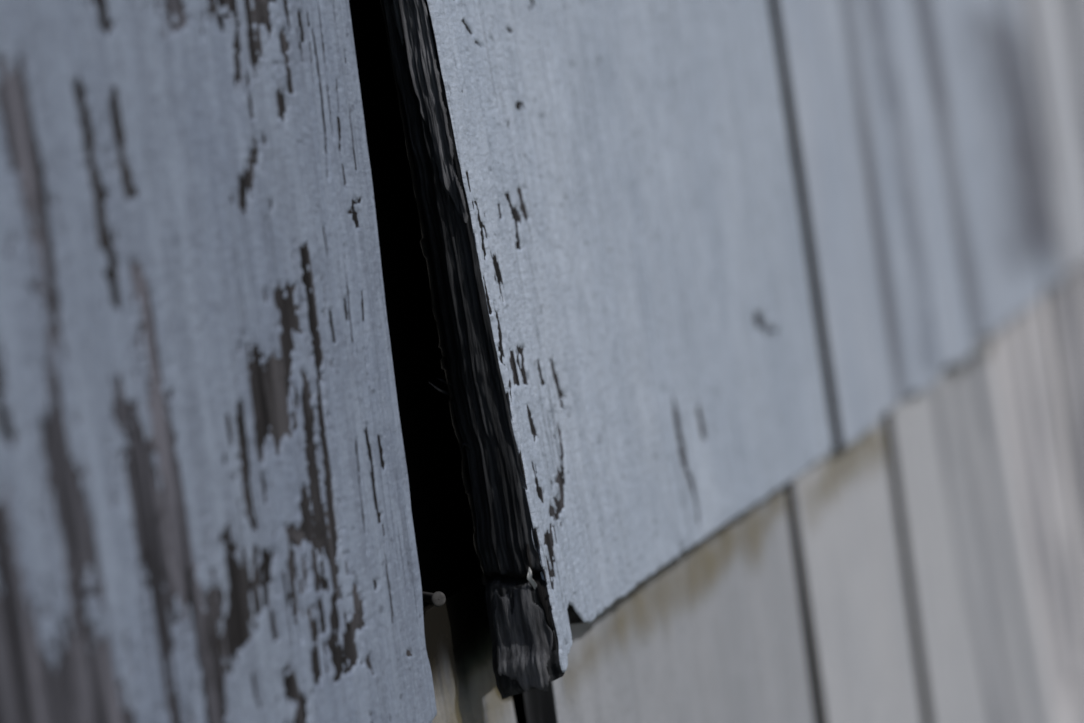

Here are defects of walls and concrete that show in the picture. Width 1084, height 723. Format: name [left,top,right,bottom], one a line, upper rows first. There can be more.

peeling [144,0,304,122]
crack [345,269,366,363]
crack [466,171,505,365]
peeling [498,187,528,250]
peeling [0,54,138,723]
peeling [70,75,373,723]
peeling [507,346,566,409]
crack [337,565,351,656]
crack [355,426,393,624]
crack [486,529,556,650]
crack [517,445,527,490]
peeling [495,425,568,692]